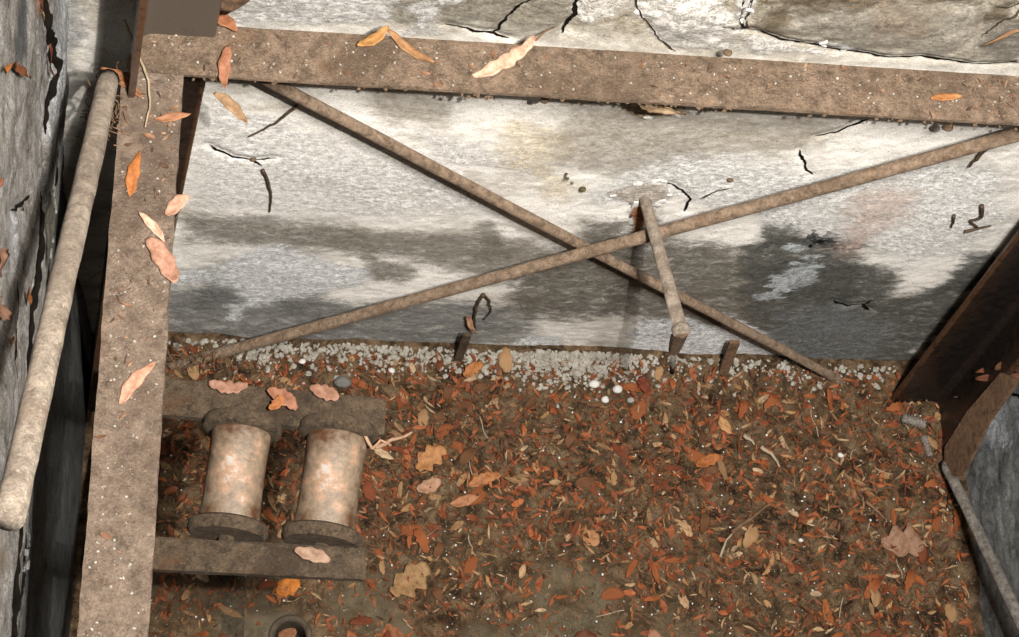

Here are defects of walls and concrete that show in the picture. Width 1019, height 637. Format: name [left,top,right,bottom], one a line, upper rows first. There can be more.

crack [447,0,530,38]
crack [562,0,578,33]
water stain [232,0,959,55]
crack [635,0,675,51]
crack [740,0,1006,64]
water stain [977,1,1019,60]
crack [982,3,1019,36]
crack [11,0,63,378]
water stain [168,89,1015,361]
crack [12,509,30,637]